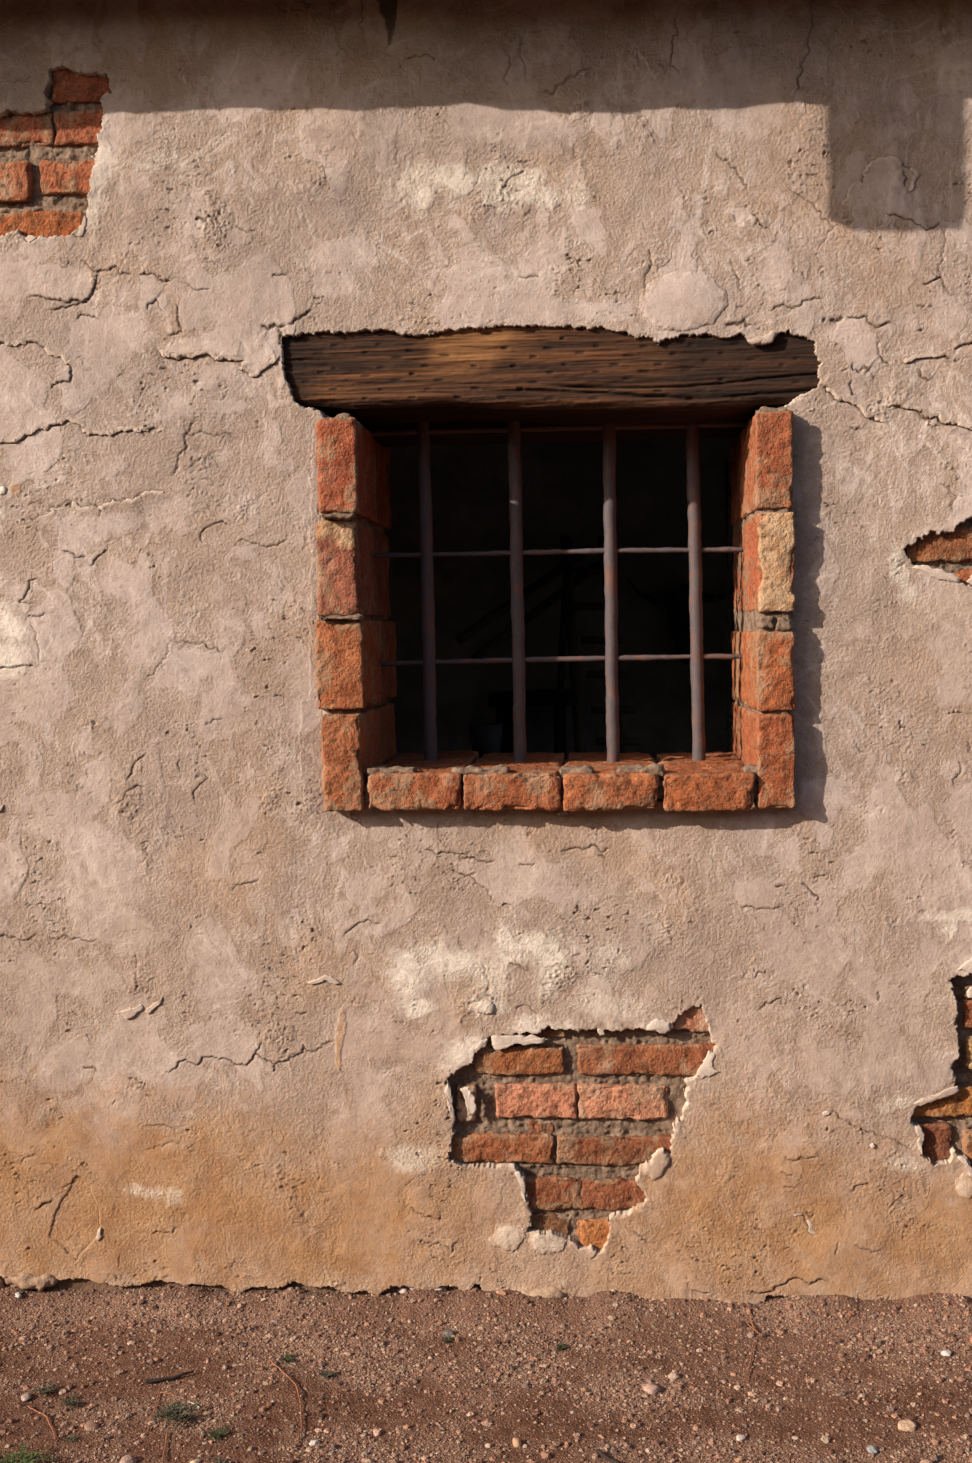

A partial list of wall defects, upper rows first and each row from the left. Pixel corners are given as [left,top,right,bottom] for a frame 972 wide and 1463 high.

spalling [0,68,111,243]
crack [787,155,950,295]
crack [26,261,311,377]
crack [725,260,972,431]
crack [0,578,45,669]
crack [0,340,236,566]
crack [200,521,287,548]
spalling [904,518,972,586]
crack [166,1012,333,1072]
leakage [0,1028,533,1295]
spalling [444,1005,719,1250]
spalling [911,958,972,1177]